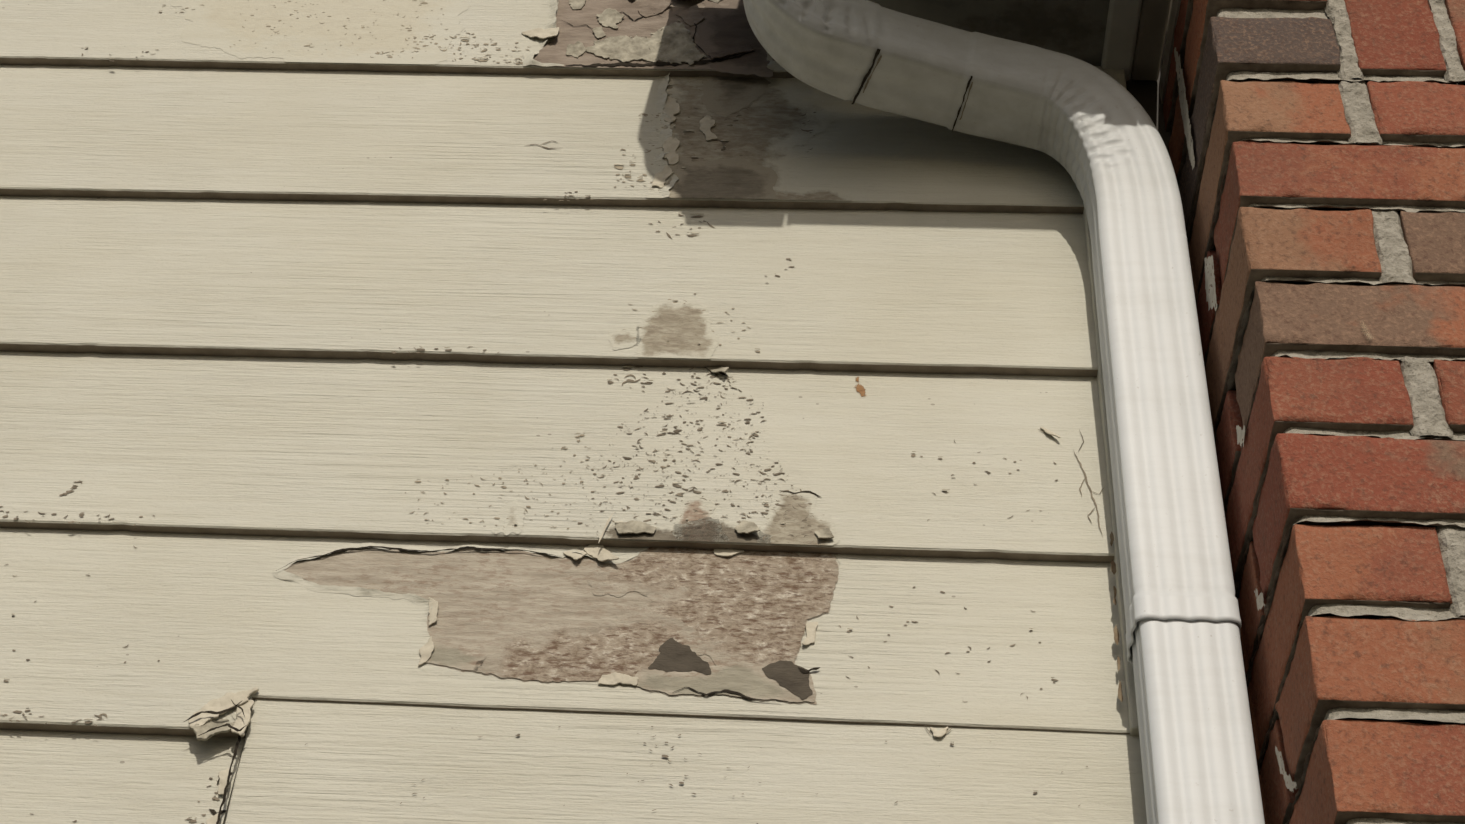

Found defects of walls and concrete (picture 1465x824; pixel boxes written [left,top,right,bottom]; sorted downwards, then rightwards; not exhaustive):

peeling [229,0,852,239]
peeling [272,293,858,714]
peeling [188,687,259,741]